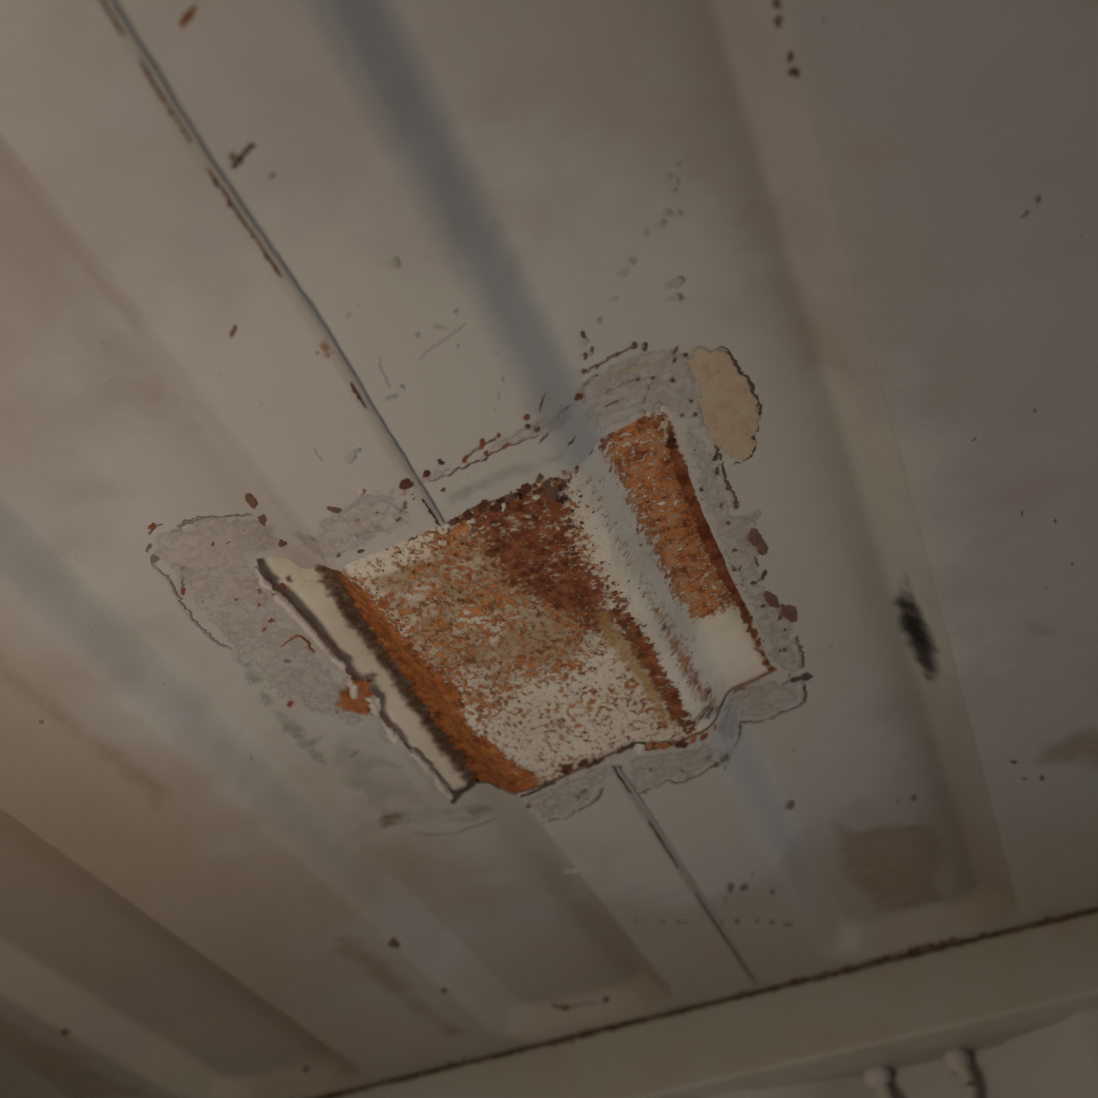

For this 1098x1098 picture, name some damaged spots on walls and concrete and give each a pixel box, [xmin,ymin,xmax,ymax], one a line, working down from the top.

corrosion [280,635,315,653]
corrosion [316,412,774,798]
peeling [399,331,813,683]
corrosion [764,590,798,623]